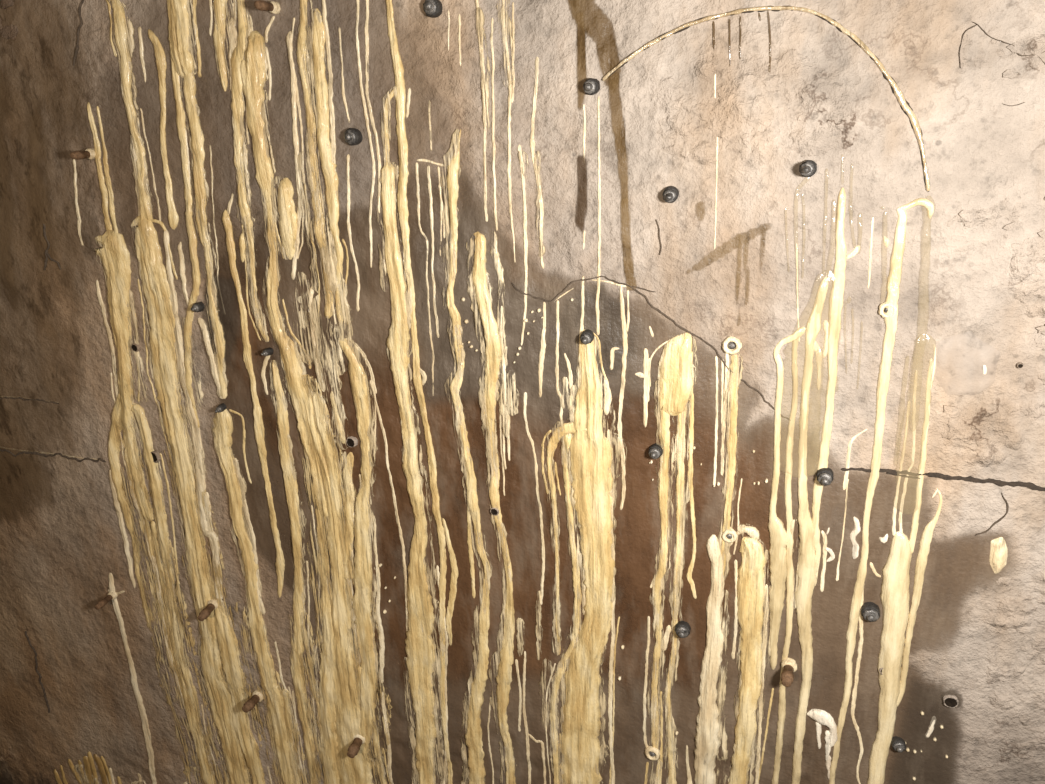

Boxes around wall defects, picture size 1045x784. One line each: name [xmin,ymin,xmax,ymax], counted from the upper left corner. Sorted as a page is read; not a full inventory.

leakage [72,159,84,246]
crack [73,0,84,66]
leakage [138,27,146,83]
leakage [148,29,179,230]
leakage [338,27,350,123]
leakage [530,57,546,269]
crack [602,6,930,192]
crack [512,276,791,421]
crack [0,447,106,463]
crack [842,467,1045,536]
crack [25,631,50,713]
leakage [54,573,157,784]